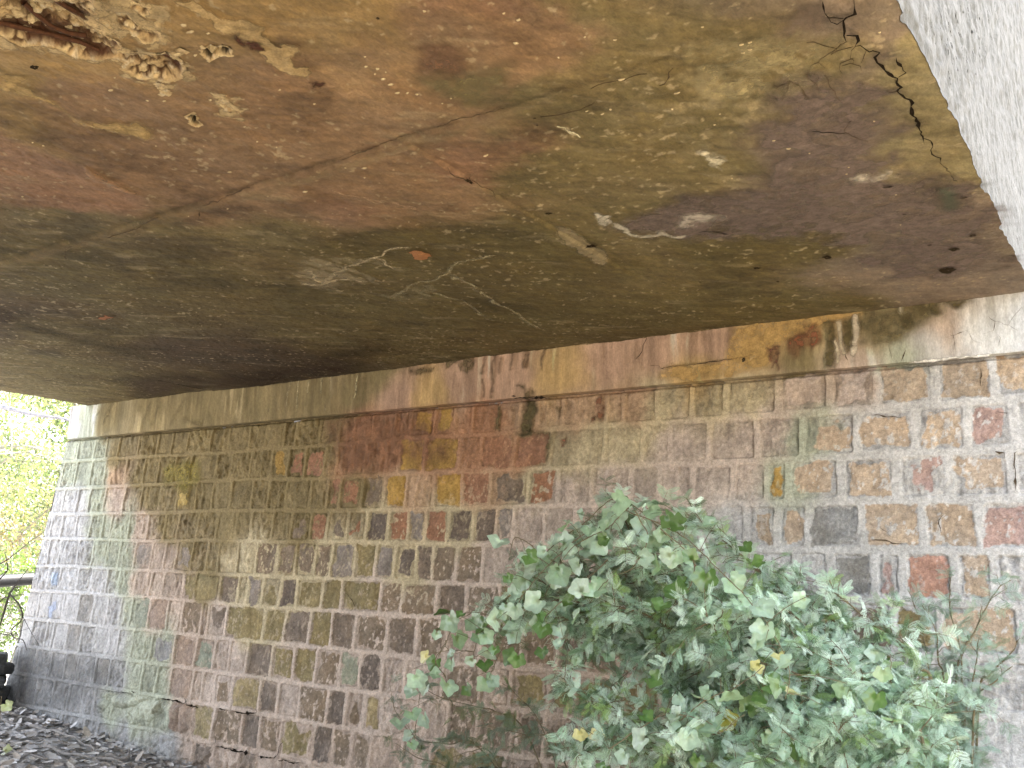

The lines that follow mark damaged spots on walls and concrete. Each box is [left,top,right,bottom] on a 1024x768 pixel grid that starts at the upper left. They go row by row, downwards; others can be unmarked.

spalling [0,0,311,102]
crack [542,68,673,117]
crack [776,2,958,183]
crack [342,136,403,160]
leakage [595,72,1007,279]
leakage [662,299,968,381]
leakage [410,349,546,429]
leakage [517,385,537,437]